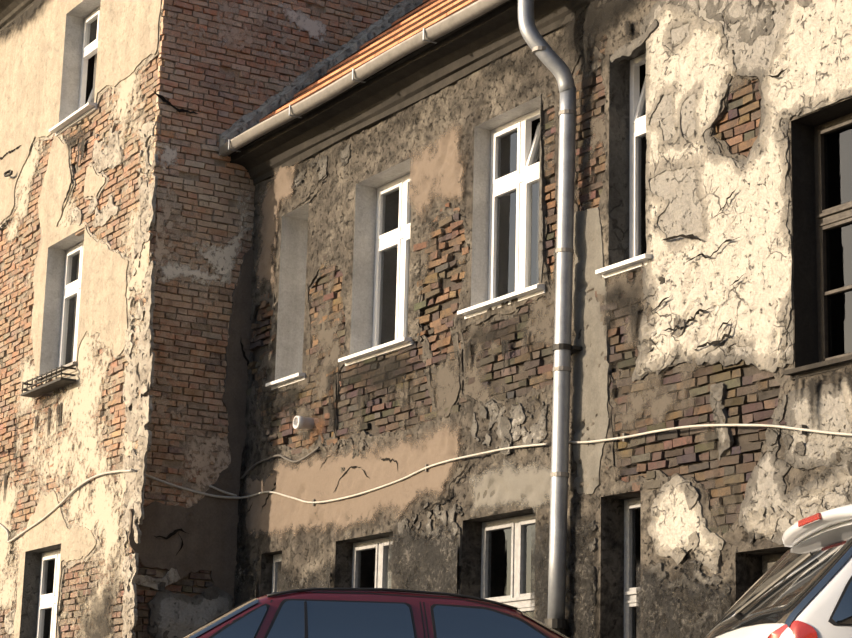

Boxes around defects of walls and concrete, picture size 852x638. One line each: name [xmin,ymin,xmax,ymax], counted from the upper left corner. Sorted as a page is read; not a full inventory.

crack [154,92,199,114]
crack [663,234,739,266]
flaking render [573,0,852,596]
flaking render [0,10,557,638]
crack [662,308,732,350]
crack [335,466,370,490]
crack [155,528,190,555]